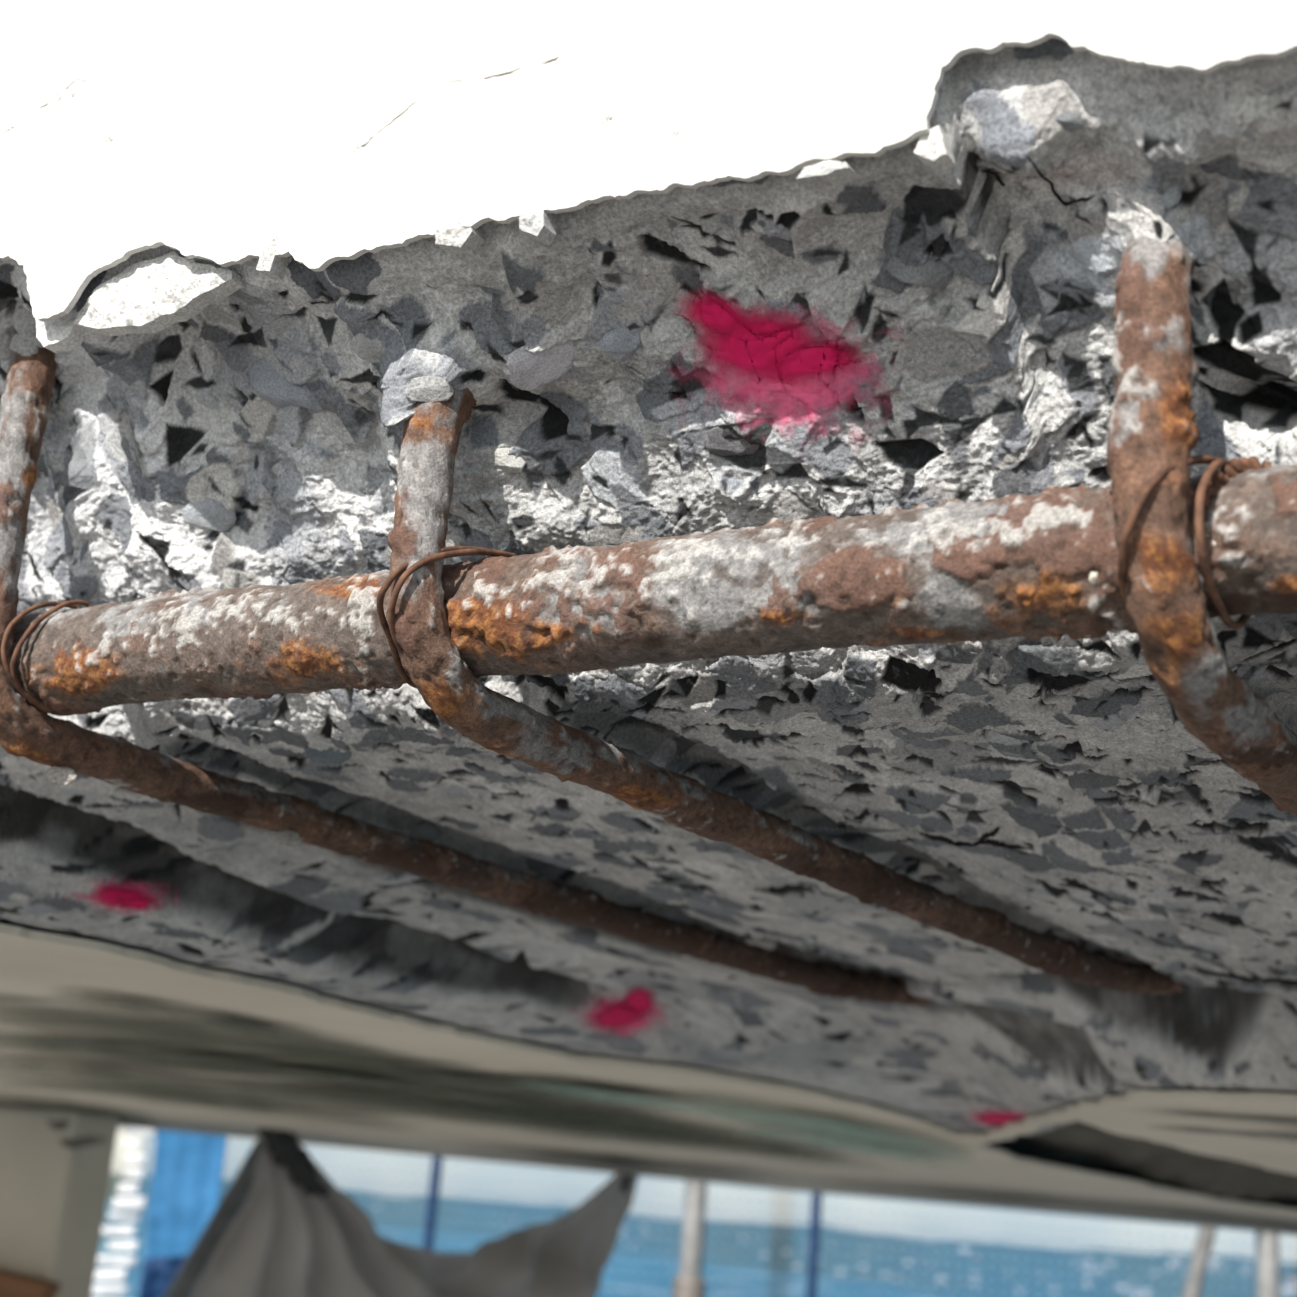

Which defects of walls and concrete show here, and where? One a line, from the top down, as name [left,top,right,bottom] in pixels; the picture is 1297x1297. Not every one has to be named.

spalling [0,38,1297,614]
spalling [0,613,1297,1136]